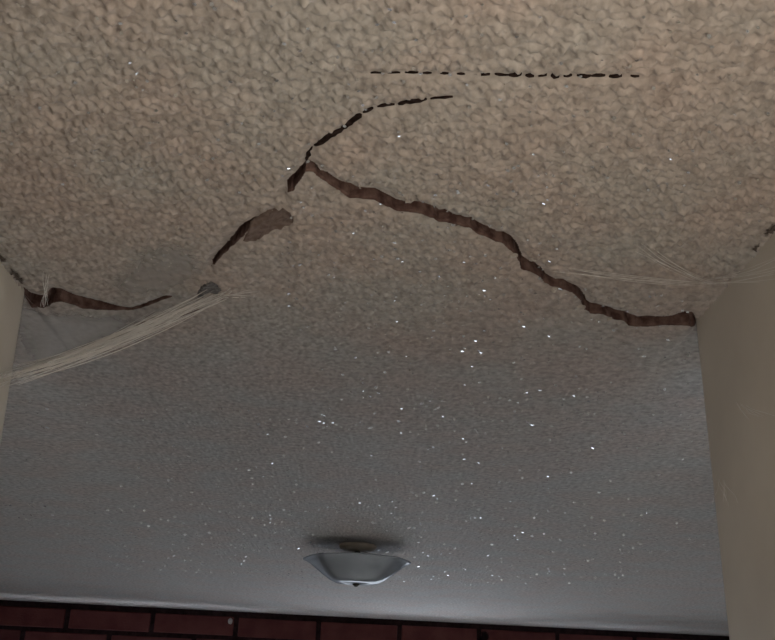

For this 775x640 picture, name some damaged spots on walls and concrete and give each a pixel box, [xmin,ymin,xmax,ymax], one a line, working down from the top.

crack [371,71,639,79]
crack [286,95,696,327]
crack [211,216,257,266]
crack [0,255,200,326]
peeling [197,281,221,298]